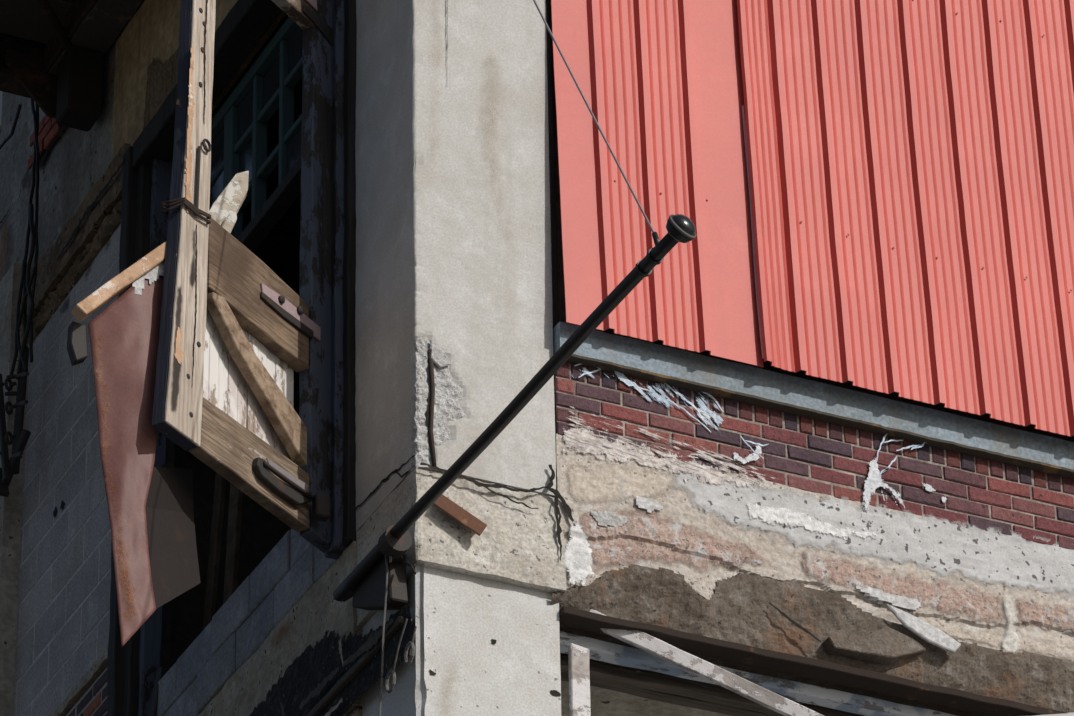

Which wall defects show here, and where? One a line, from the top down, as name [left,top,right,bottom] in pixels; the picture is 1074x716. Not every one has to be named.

spalling [411,335,466,470]
crack [354,455,576,561]
spalling [551,496,1074,713]